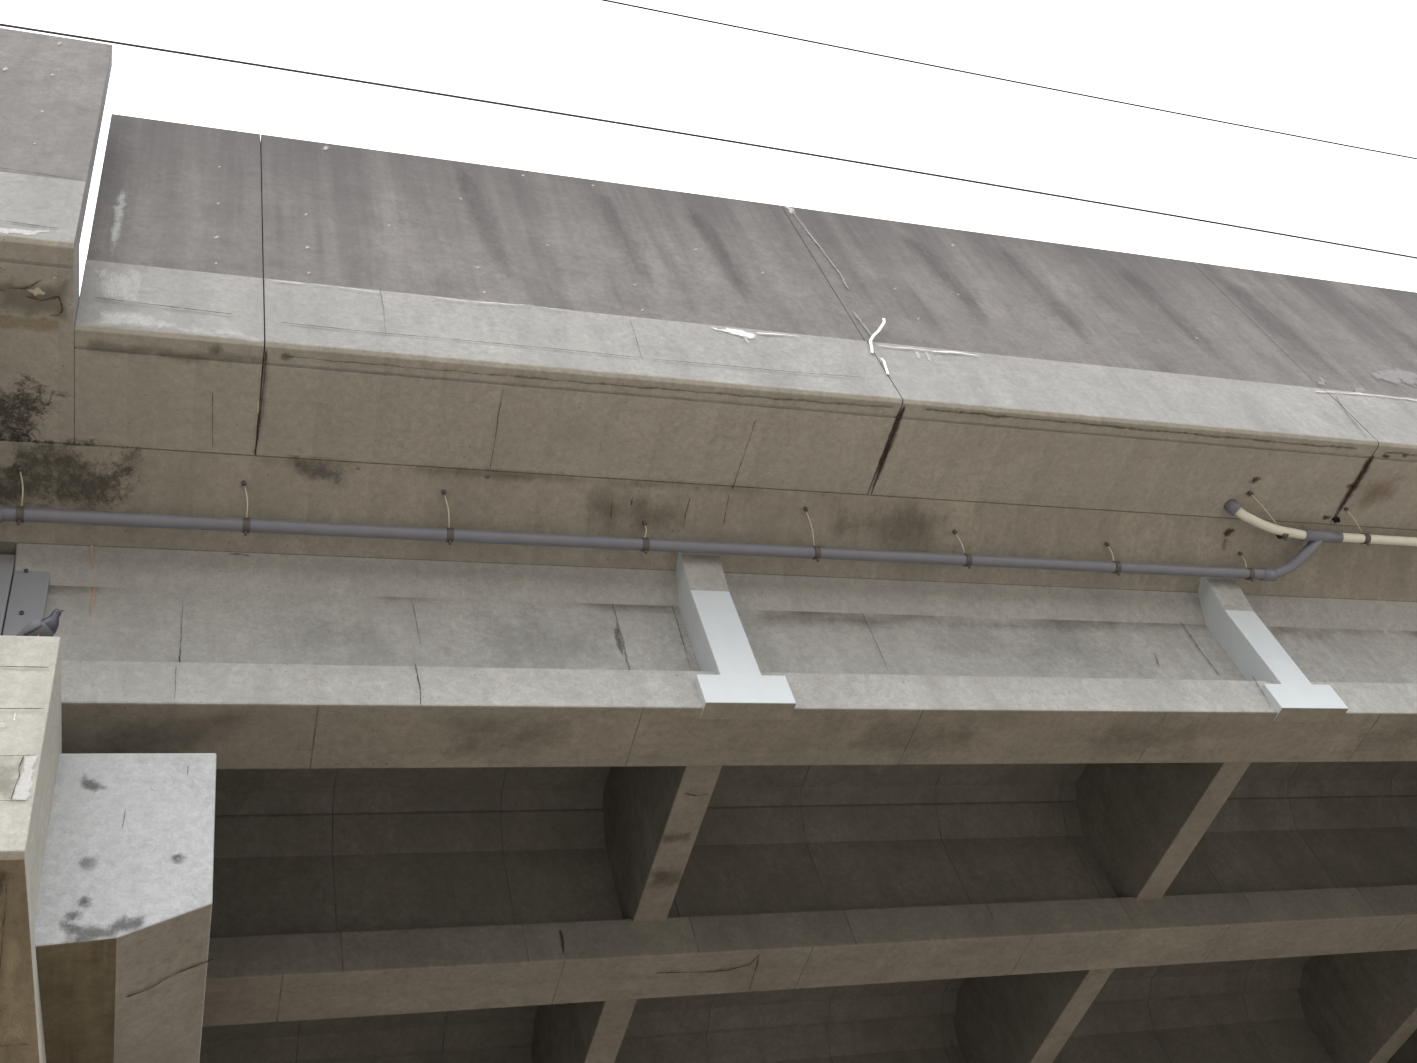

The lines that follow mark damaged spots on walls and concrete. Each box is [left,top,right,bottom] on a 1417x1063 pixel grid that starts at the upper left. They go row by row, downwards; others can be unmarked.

damp [0,377,132,503]